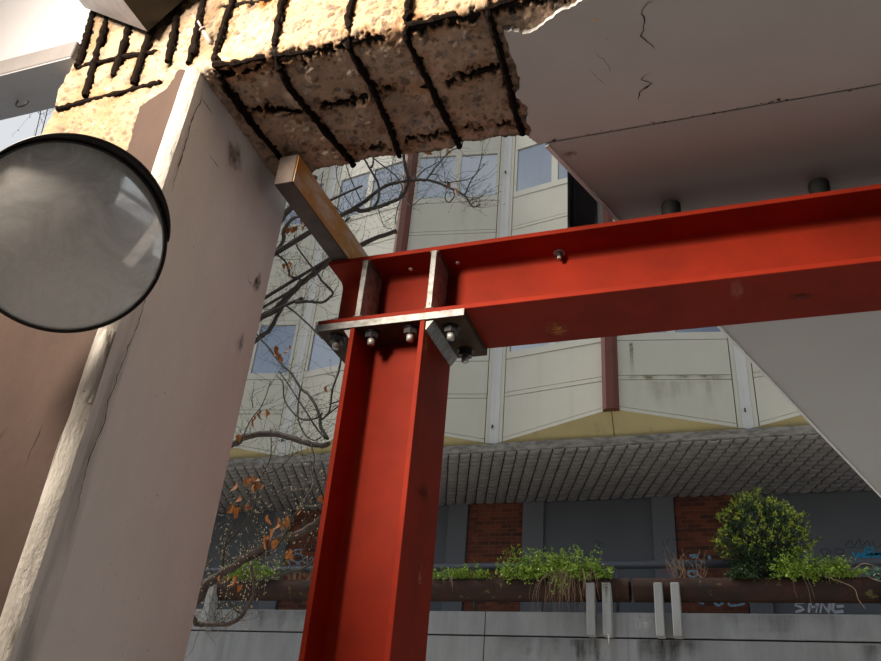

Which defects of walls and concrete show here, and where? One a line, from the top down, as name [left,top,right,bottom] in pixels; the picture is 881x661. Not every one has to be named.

crack [640,1,654,48]
spalling [41,0,577,177]
crack [548,84,878,143]